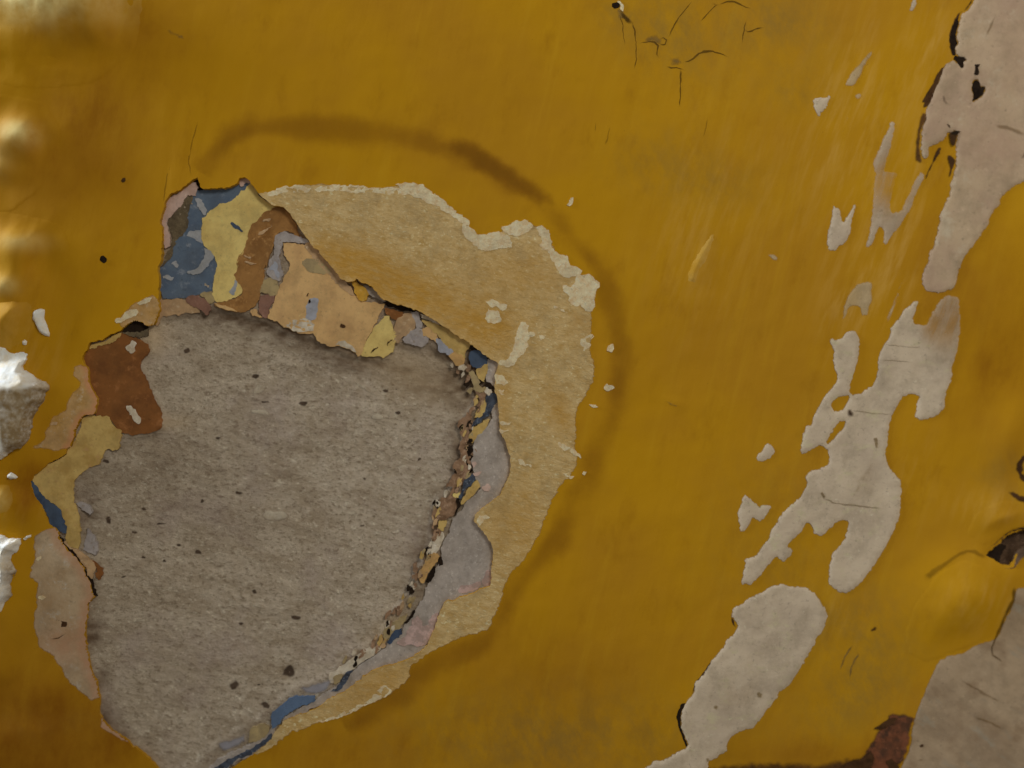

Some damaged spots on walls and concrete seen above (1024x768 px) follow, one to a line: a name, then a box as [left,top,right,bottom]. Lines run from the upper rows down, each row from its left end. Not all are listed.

crack [612,1,759,104]
flaking render [0,178,615,768]
peeling [646,0,1024,768]
rust [841,714,914,768]